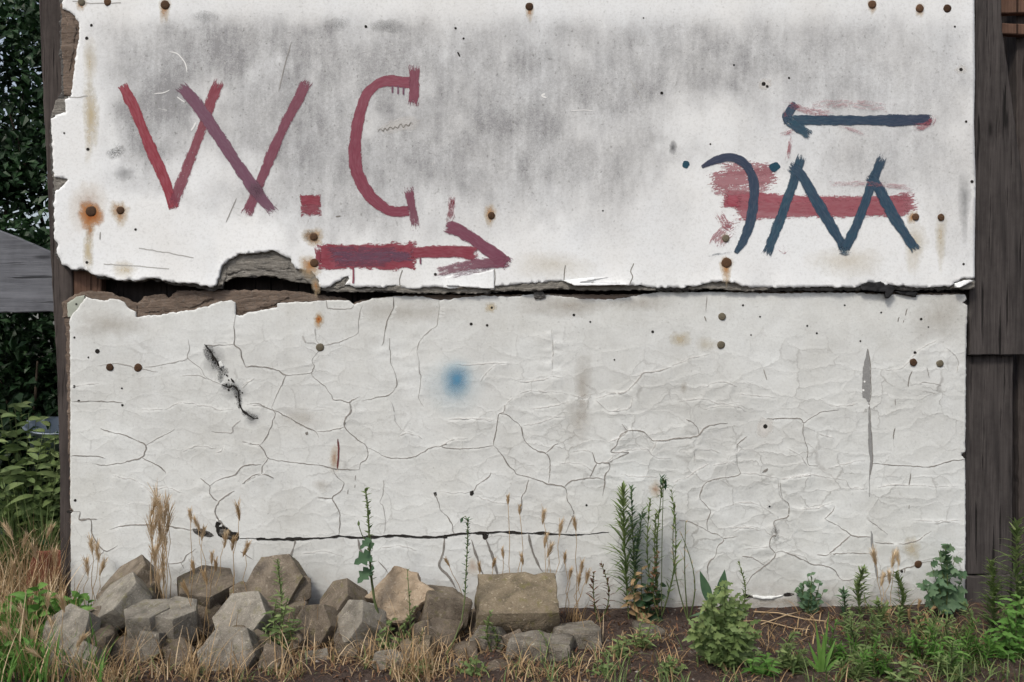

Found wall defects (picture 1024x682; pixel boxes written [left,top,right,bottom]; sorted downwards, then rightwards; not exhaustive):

damp [86,100,95,140]
corrosion [80,204,125,235]
spalling [62,251,656,318]
crack [73,429,173,473]
crack [99,270,946,597]
crack [873,459,963,467]
crack [70,511,195,568]